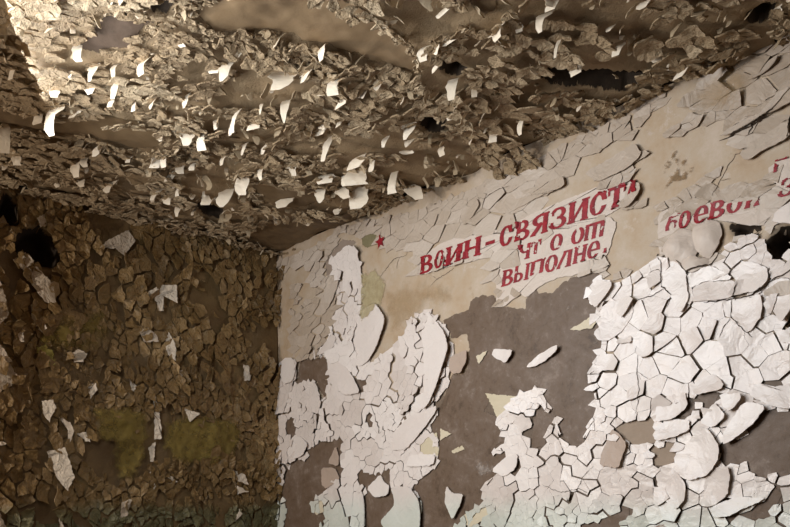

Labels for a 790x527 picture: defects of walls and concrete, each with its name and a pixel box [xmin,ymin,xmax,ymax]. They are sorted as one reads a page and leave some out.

peeling [0,0,627,211]
peeling [625,0,790,160]
crack [712,109,790,195]
peeling [0,107,435,527]
spalling [77,62,790,527]
crack [638,250,722,306]
crack [704,270,790,337]